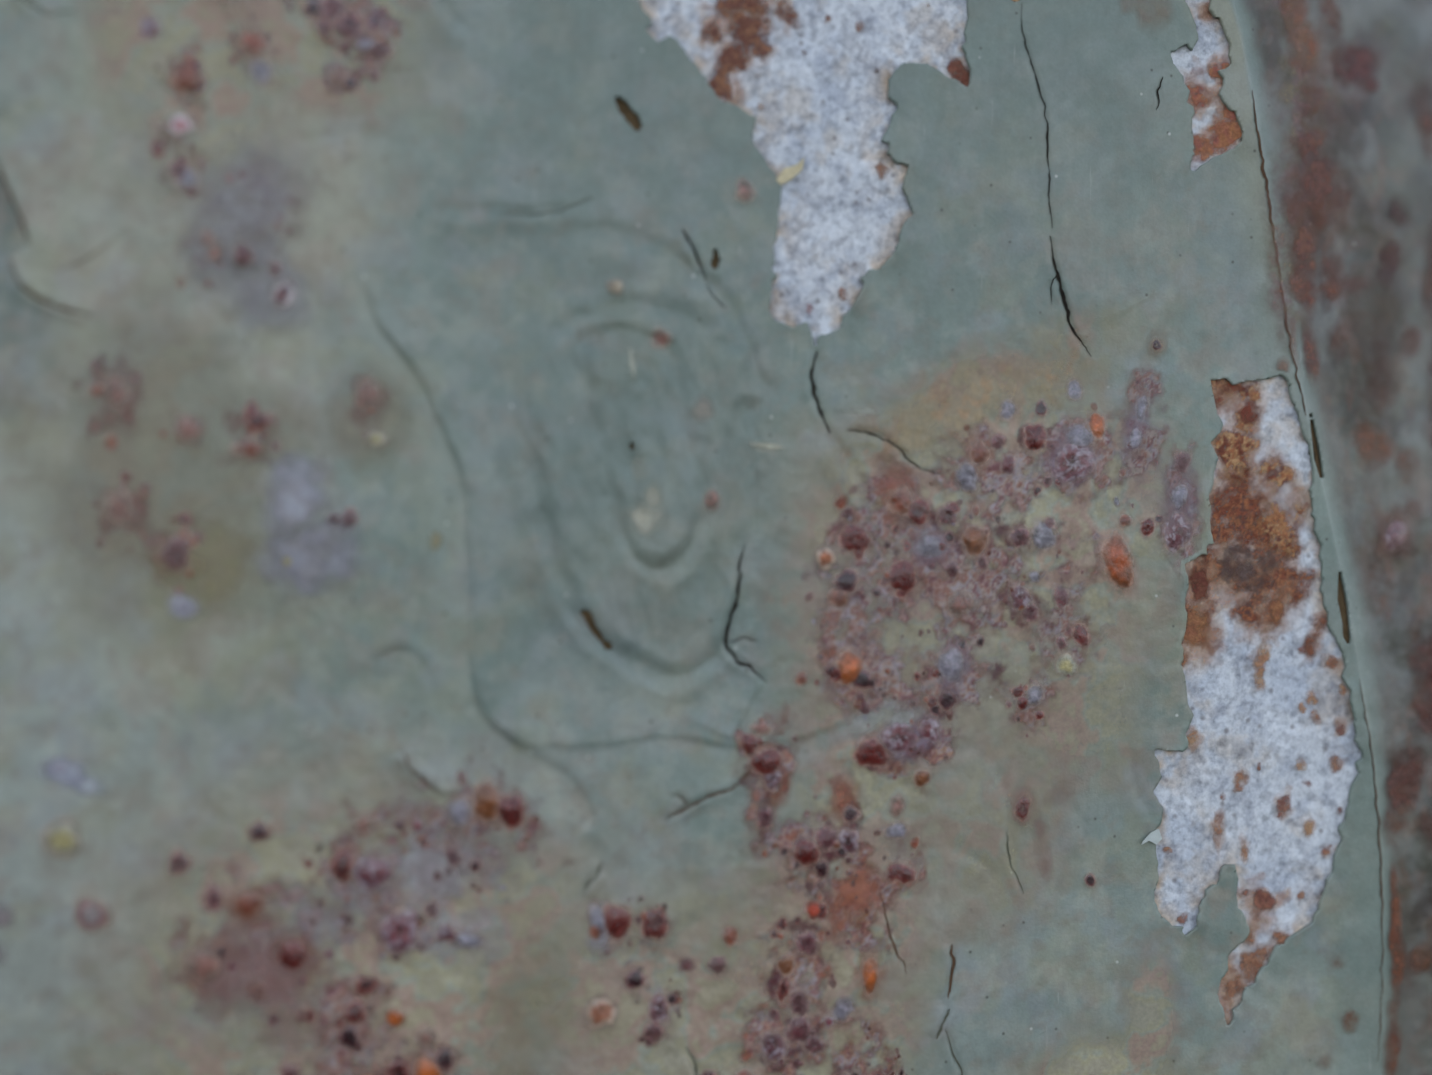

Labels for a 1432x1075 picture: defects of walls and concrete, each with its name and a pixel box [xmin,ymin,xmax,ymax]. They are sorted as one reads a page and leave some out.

corrosion [107,0,403,198]
peeling [615,98,641,132]
peeling [639,0,970,346]
crack [1021,9,1091,356]
peeling [1171,0,1242,171]
crack [1252,90,1306,414]
corrosion [146,356,1203,1075]
crack [724,544,767,682]
peeling [1141,375,1361,1025]
crack [1359,679,1384,1056]
corrosion [1383,519,1409,551]
corrosion [1389,871,1404,986]